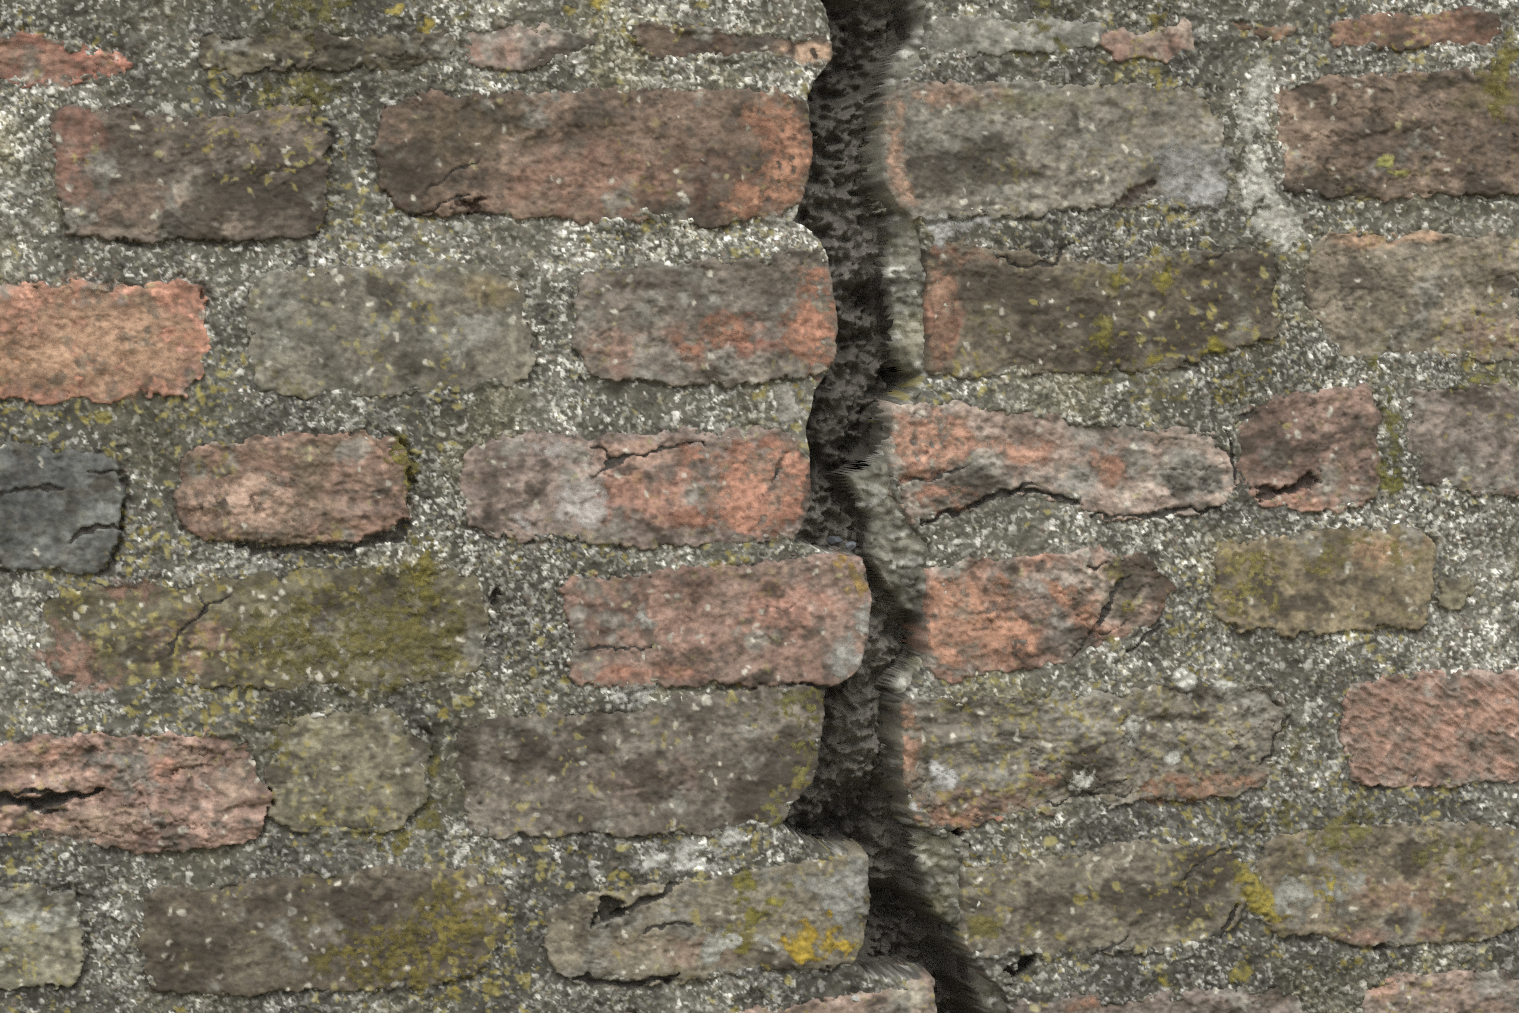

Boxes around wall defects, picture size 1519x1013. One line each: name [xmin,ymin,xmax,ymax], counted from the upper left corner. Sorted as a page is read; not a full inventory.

crack [590,441,706,472]
crack [771,0,1256,1013]
crack [1260,715,1290,764]